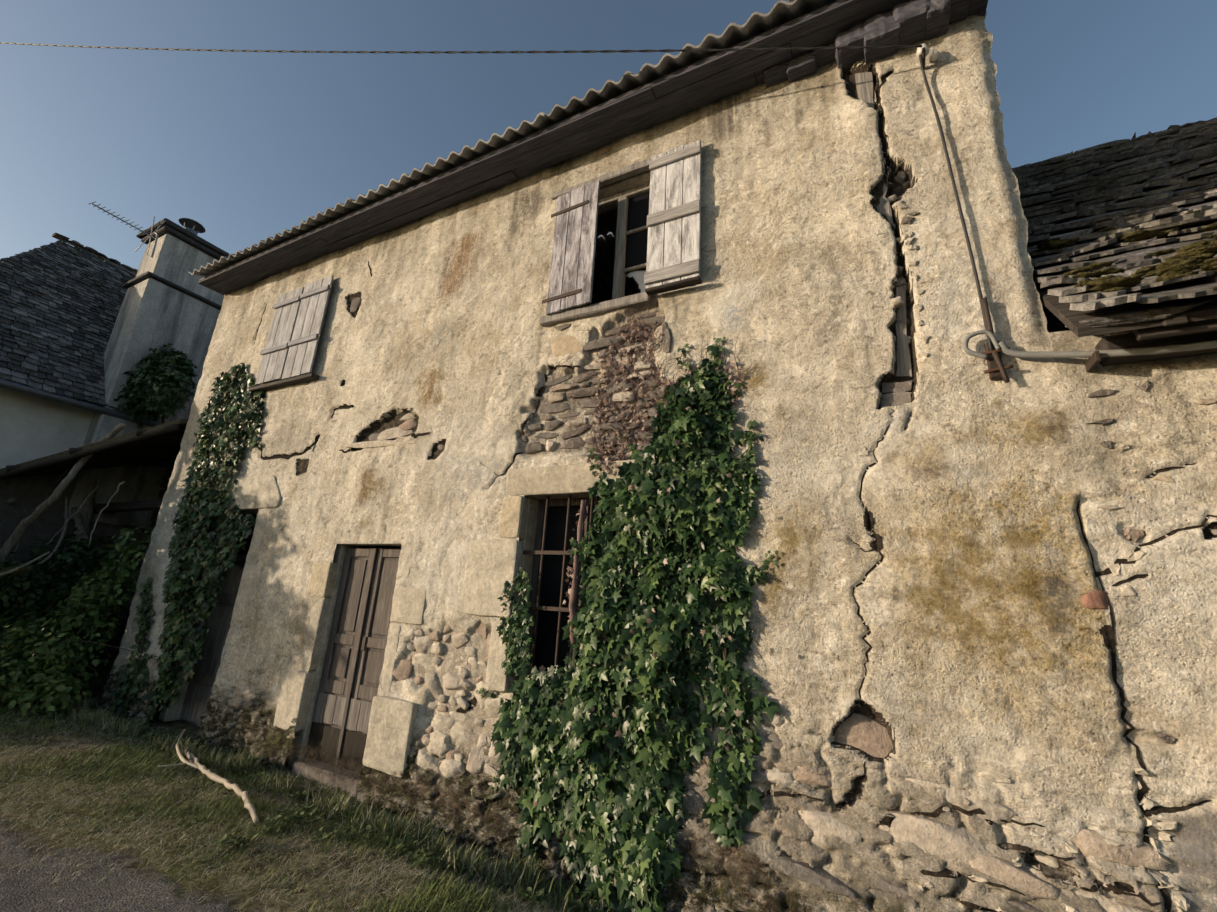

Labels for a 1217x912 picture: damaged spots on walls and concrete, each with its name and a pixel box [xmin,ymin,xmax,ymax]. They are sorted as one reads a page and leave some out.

spalling [339,407,446,460]
spalling [514,298,681,460]
crack [841,62,931,700]
peeling [392,622,515,794]
peeling [741,700,1169,912]
crack [1077,499,1217,912]